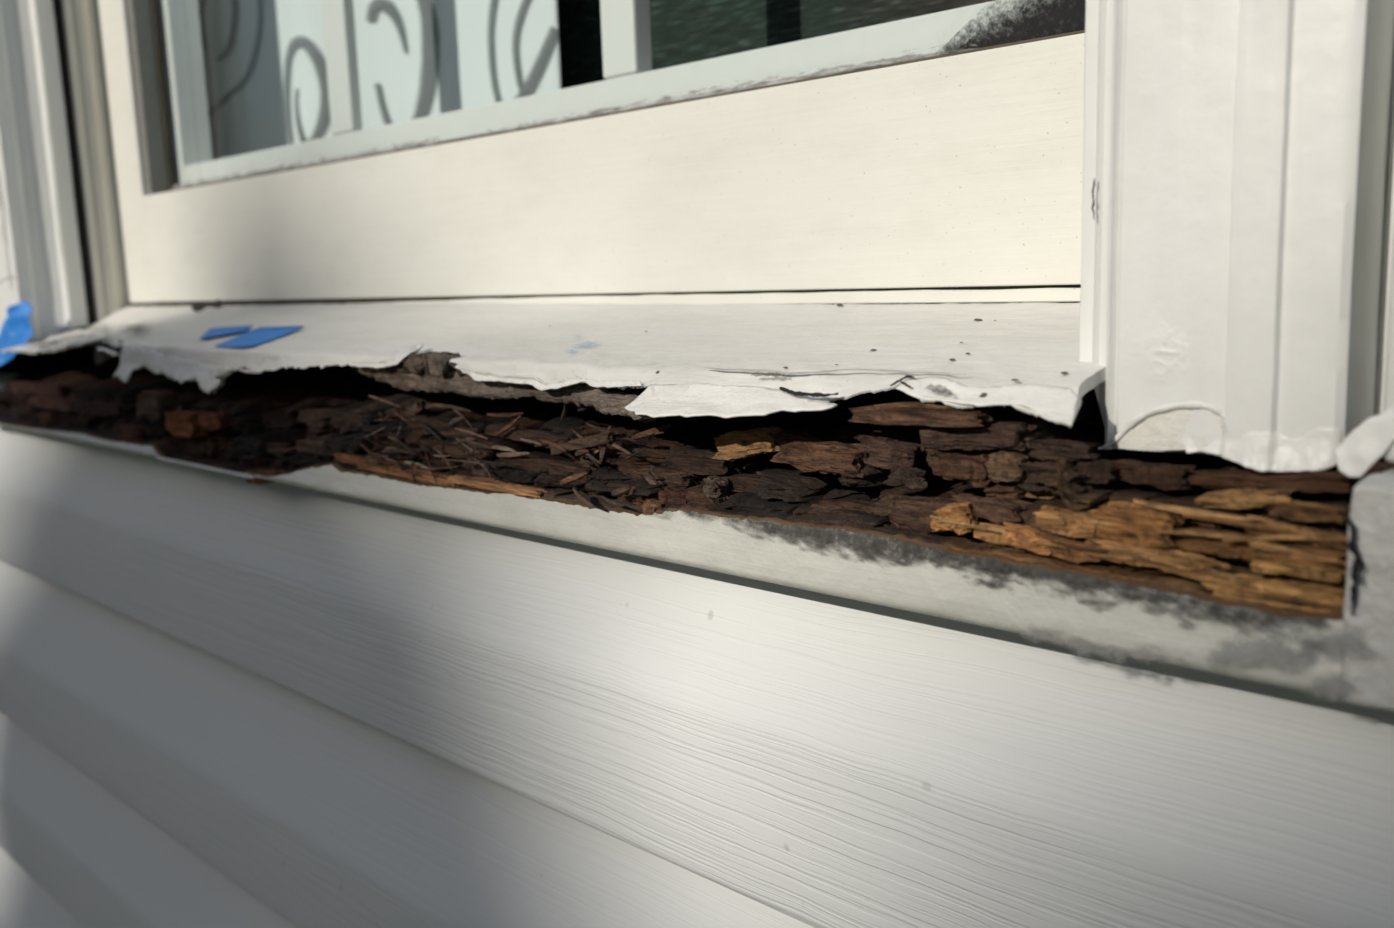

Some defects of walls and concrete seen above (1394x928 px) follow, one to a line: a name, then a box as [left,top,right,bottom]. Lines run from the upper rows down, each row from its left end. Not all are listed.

peeling [33,329,261,394]
peeling [347,344,423,369]
peeling [462,368,838,419]
peeling [894,376,1079,427]
peeling [1098,401,1394,477]
damp [684,511,1370,672]